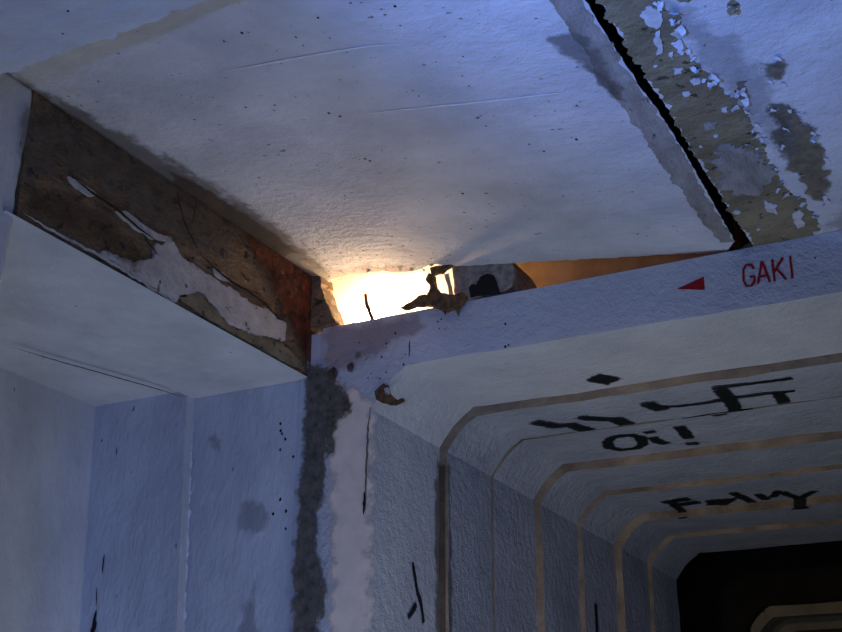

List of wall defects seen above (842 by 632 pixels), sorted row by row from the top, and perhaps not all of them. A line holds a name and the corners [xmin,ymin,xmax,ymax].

peeling [67,176,96,197]
peeling [27,211,305,368]
peeling [516,0,831,288]
leakage [290,365,351,632]